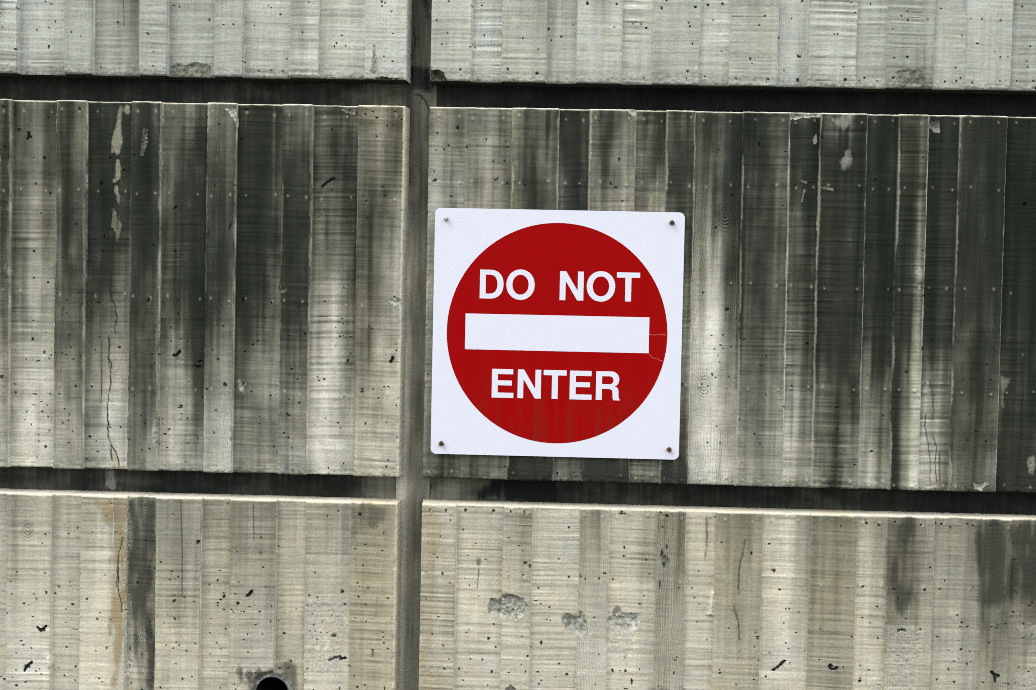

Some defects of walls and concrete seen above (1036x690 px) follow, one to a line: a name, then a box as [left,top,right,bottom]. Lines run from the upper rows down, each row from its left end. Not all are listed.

damp [112,106,130,194]
crack [101,272,119,468]
damp [899,517,912,544]
damp [130,500,154,688]
spalling [488,593,528,621]
spalling [561,611,588,638]
spalling [607,612,641,634]
damp [892,559,910,611]
damp [977,521,1036,603]
damp [239,664,296,685]